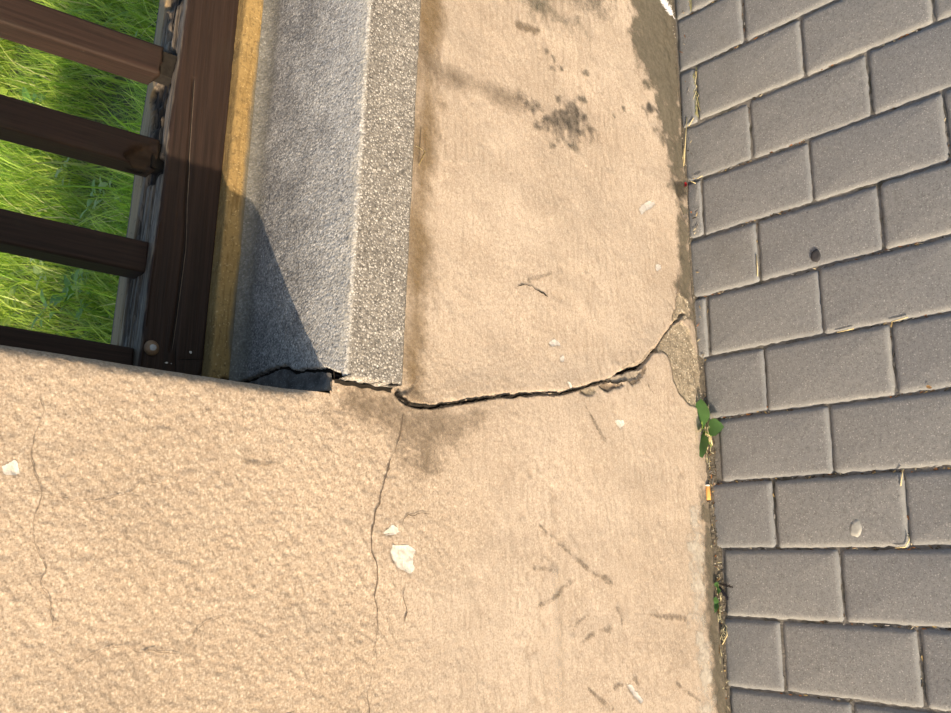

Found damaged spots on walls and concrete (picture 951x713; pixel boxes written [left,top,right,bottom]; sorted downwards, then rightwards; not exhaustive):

damp [536,97,591,135]
crack [175,341,654,713]